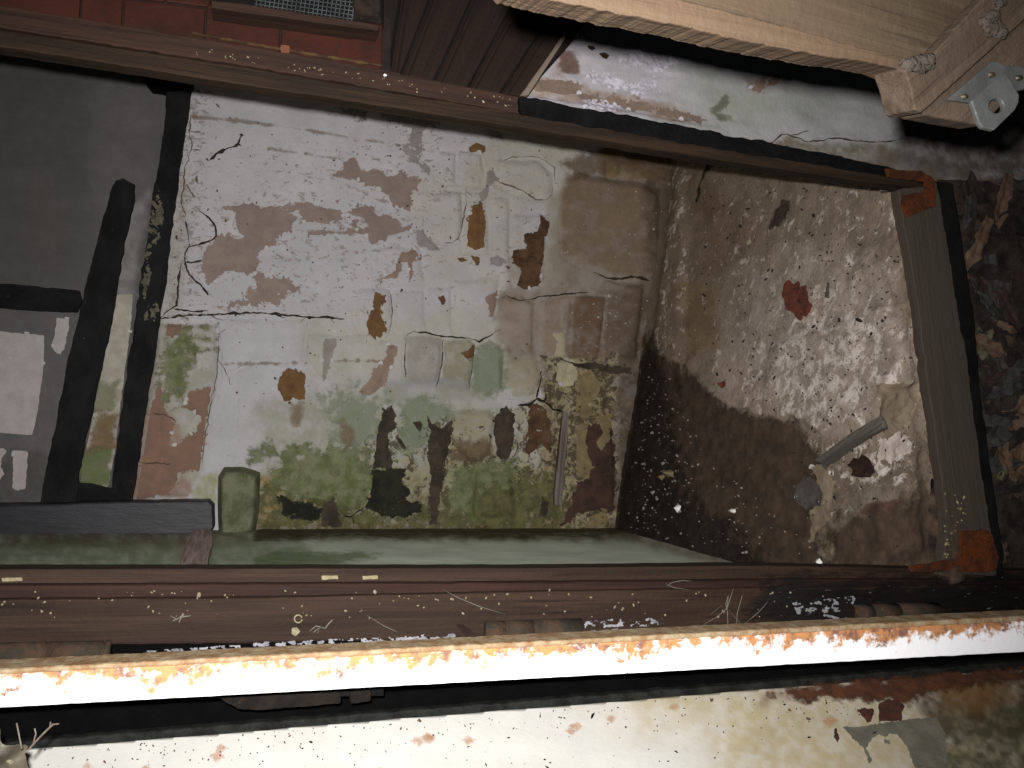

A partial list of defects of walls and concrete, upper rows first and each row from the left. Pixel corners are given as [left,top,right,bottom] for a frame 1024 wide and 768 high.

peeling [137,384,211,499]
crack [161,114,343,467]
spalling [277,368,309,405]
spalling [276,493,348,529]
peeling [200,107,550,396]
peeling [360,405,454,525]
crack [388,291,498,388]
peeling [489,401,553,460]
crack [506,272,649,301]
peeling [538,421,619,528]
peeling [559,358,632,374]
damp [254,334,1024,622]